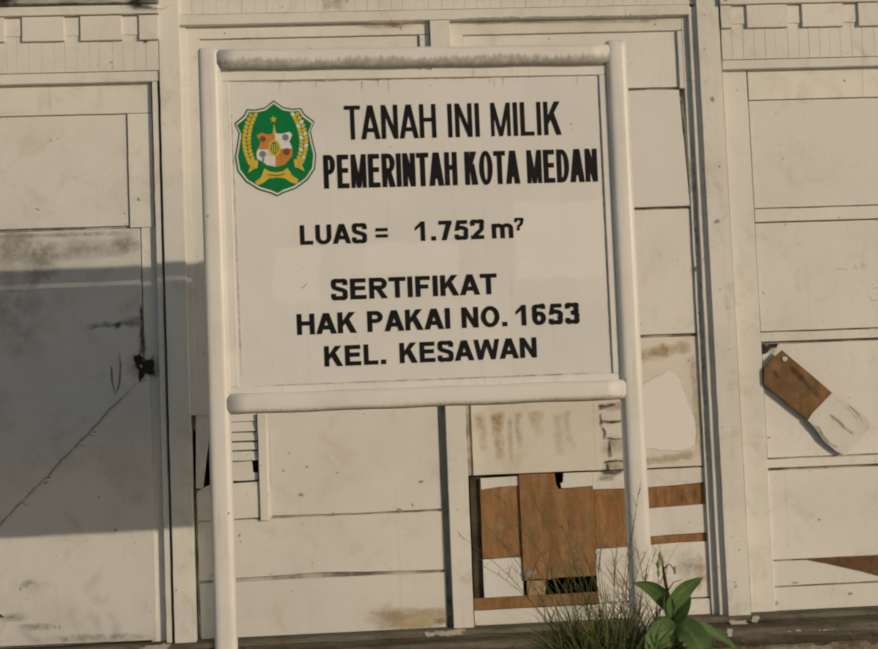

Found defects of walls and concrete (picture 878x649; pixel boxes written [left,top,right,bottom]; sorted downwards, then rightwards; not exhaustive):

spalling [680,98,695,191]
crack [0,355,122,525]
peeling [594,489,627,548]
peeling [648,483,705,508]
peeling [650,534,707,544]
peeling [808,556,878,575]